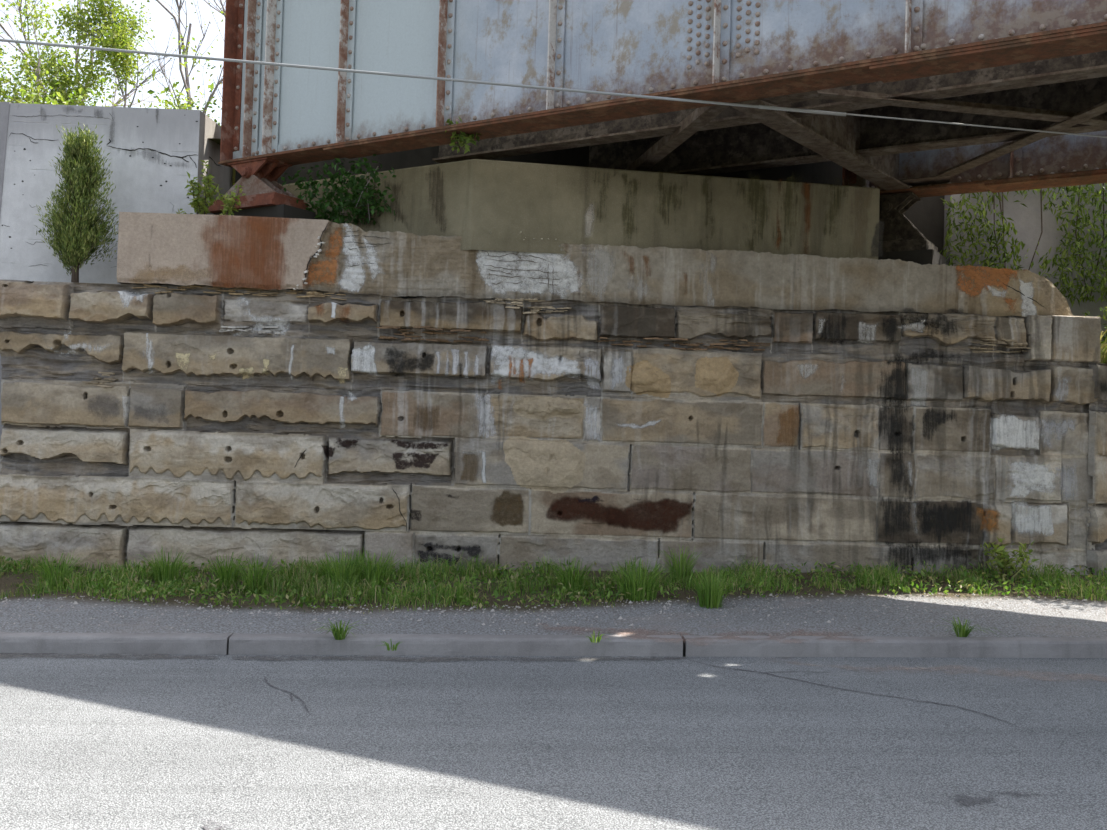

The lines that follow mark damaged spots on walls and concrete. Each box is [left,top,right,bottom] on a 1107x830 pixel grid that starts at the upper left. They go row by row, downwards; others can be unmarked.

crack [9,114,220,168]
rust [956,265,1017,310]
water stain [858,309,963,343]
water stain [175,353,190,370]
water stain [337,345,623,429]
water stain [477,395,496,438]
water stain [461,452,486,483]
water stain [878,349,972,569]